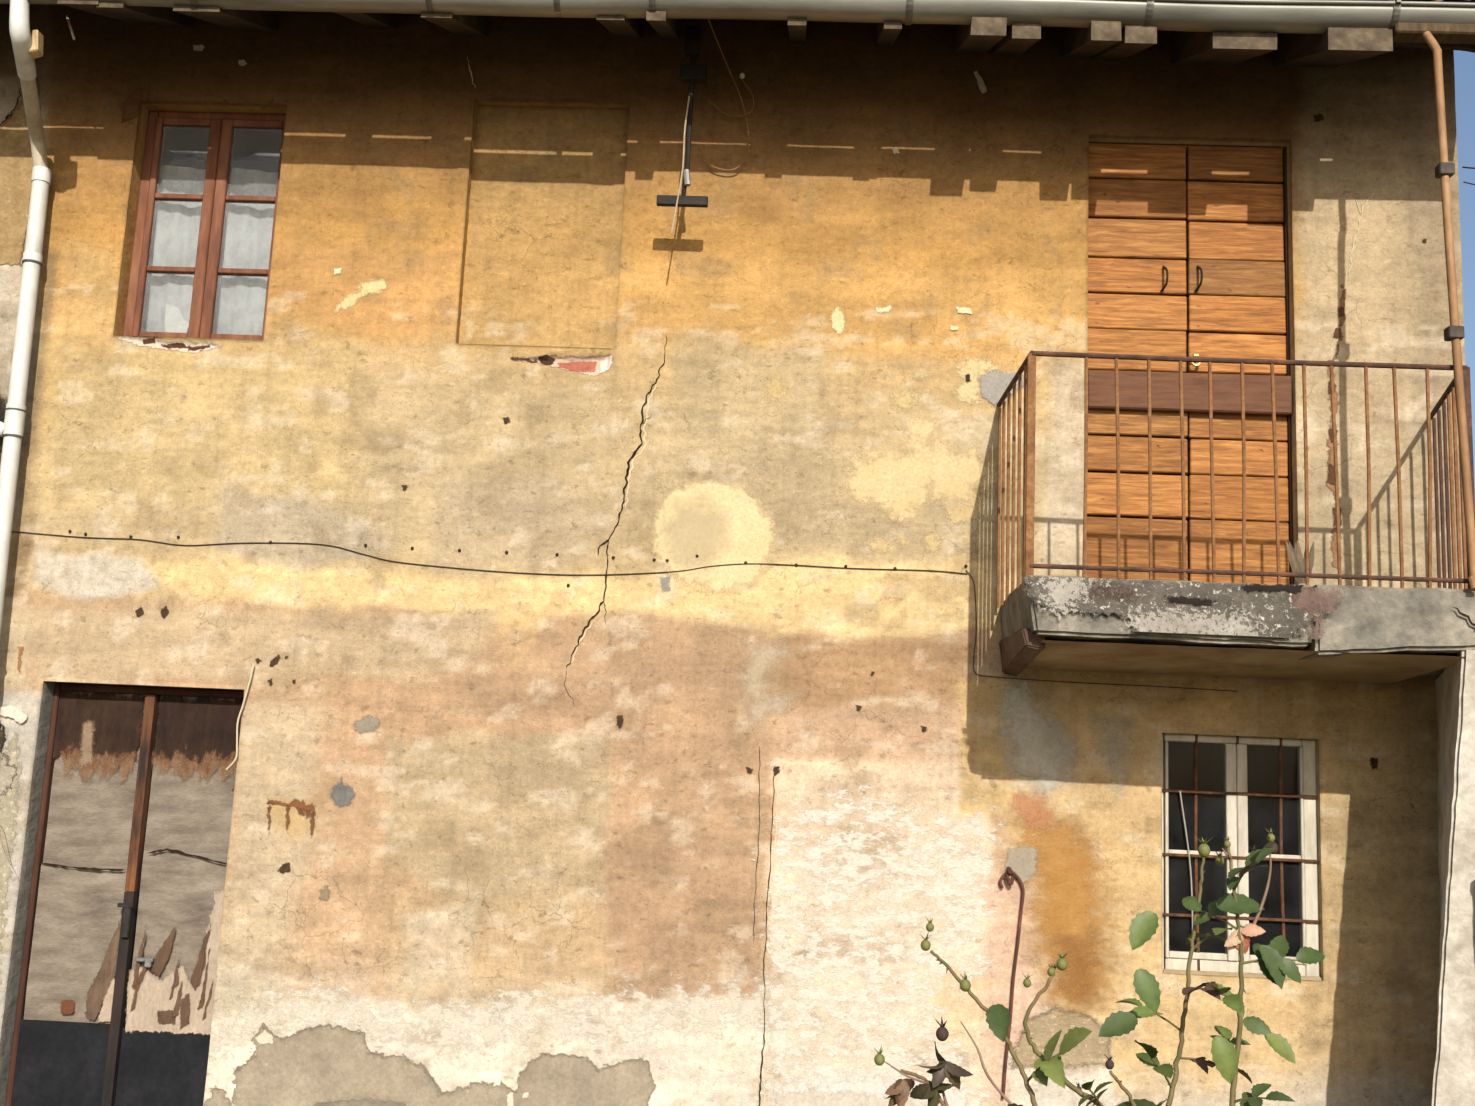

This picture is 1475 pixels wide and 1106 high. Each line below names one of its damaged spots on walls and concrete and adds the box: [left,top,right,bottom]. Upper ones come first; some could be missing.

peeling [334,279,388,312]
peeling [510,353,613,377]
crack [564,336,667,699]
corrosion [266,799,315,838]
peeling [203,773,1008,1106]
crack [753,748,777,1106]
peeling [1011,1007,1111,1069]